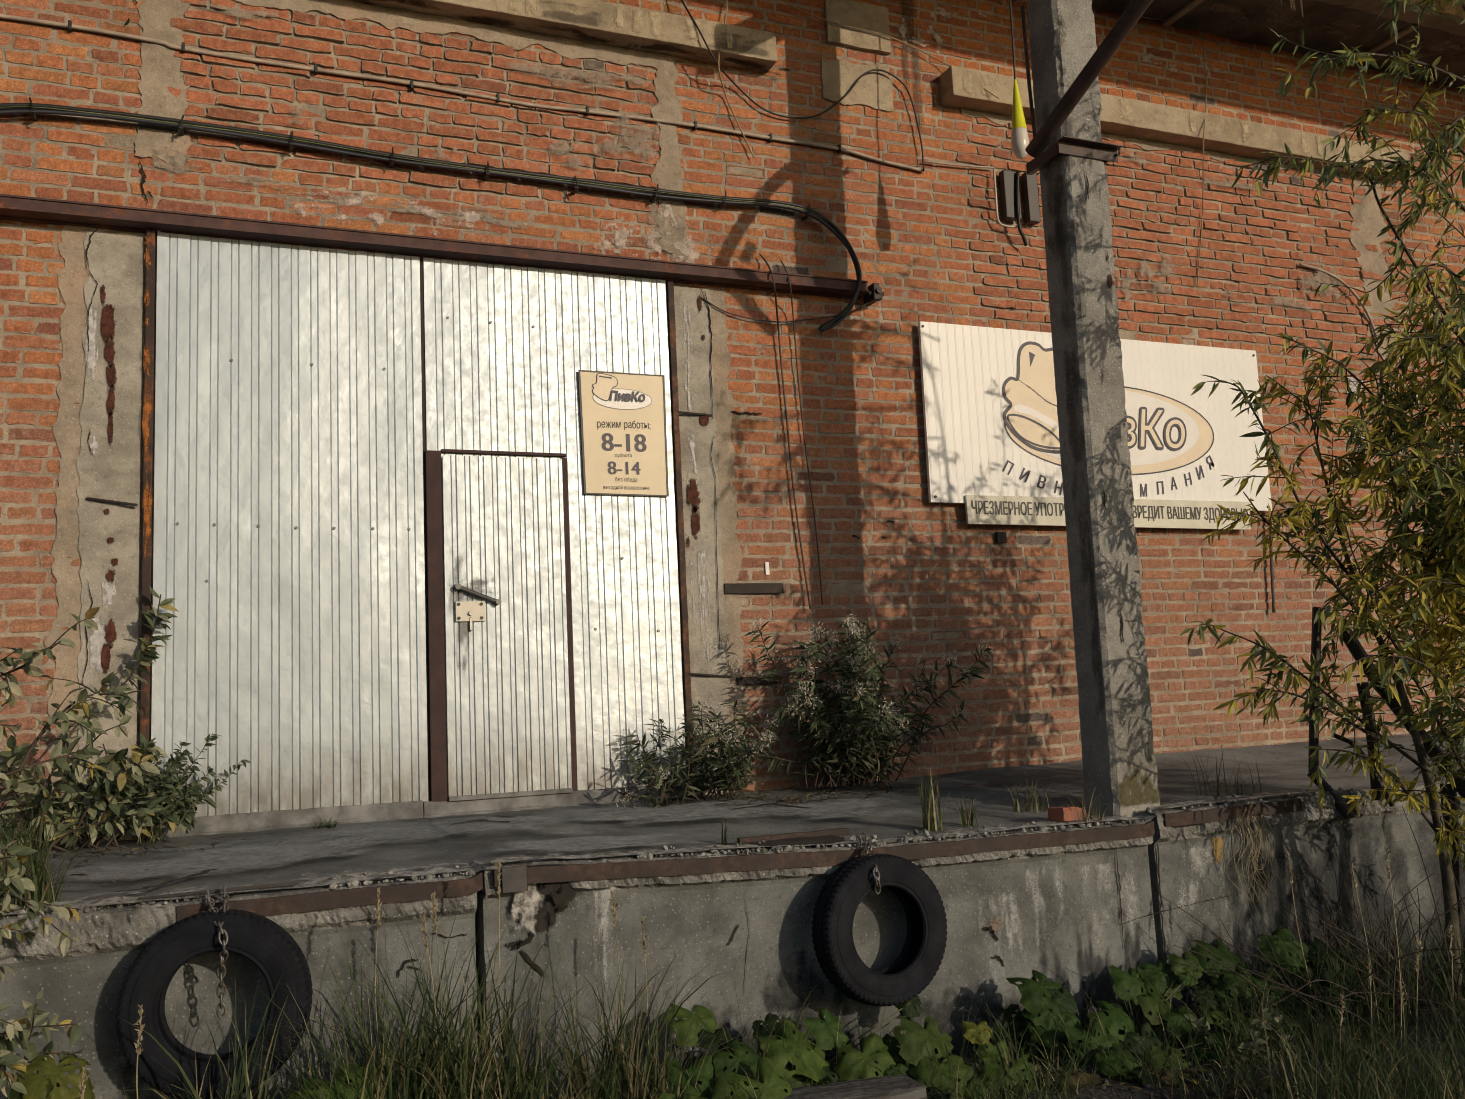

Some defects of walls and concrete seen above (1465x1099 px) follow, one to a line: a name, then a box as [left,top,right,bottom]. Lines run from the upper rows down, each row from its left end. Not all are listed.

crack [86,227,99,351]
spalling [85,285,117,455]
corrosion [142,396,152,557]
crack [82,580,93,683]
peeling [89,537,118,673]
spalling [1157,790,1317,809]
spalling [511,881,576,935]
spalling [1,816,1139,915]
damp [983,926,1004,967]
damp [1035,932,1159,1030]
damp [1180,822,1465,1009]